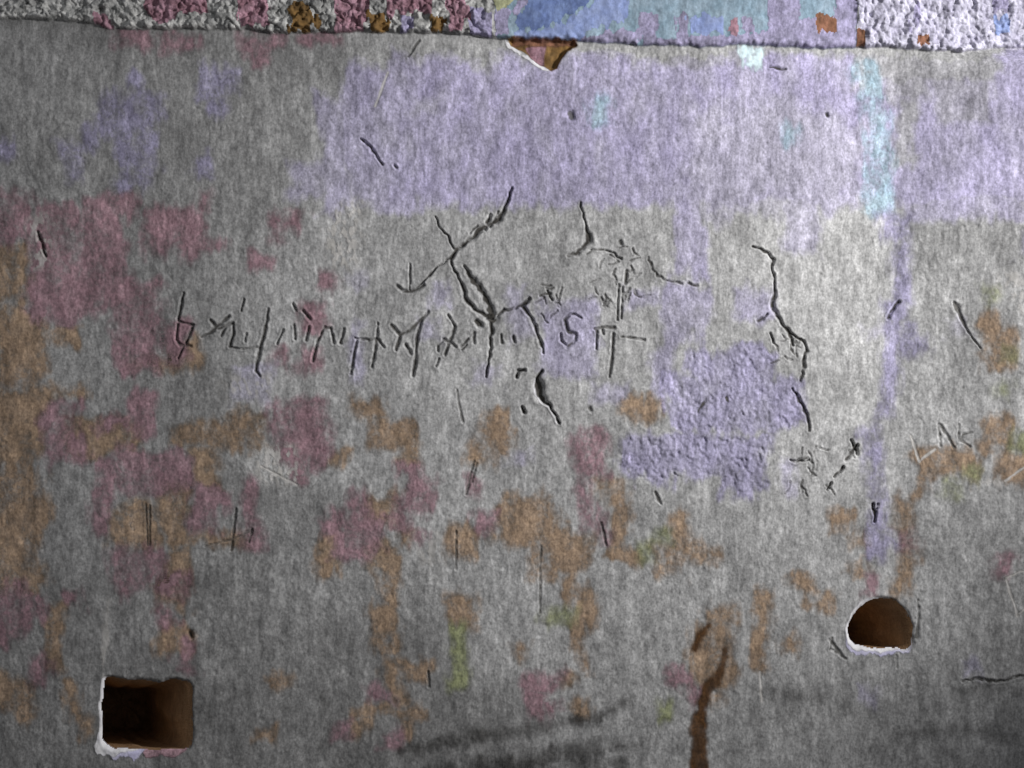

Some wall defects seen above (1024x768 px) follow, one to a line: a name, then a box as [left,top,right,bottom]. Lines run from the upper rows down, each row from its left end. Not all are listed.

flaking render [505,36,577,71]
crack [572,216,697,301]
crack [418,192,559,423]
crack [752,246,857,494]
hole [845,597,913,657]
hole [94,677,193,761]
rust [689,607,739,768]
crack [962,674,1020,682]